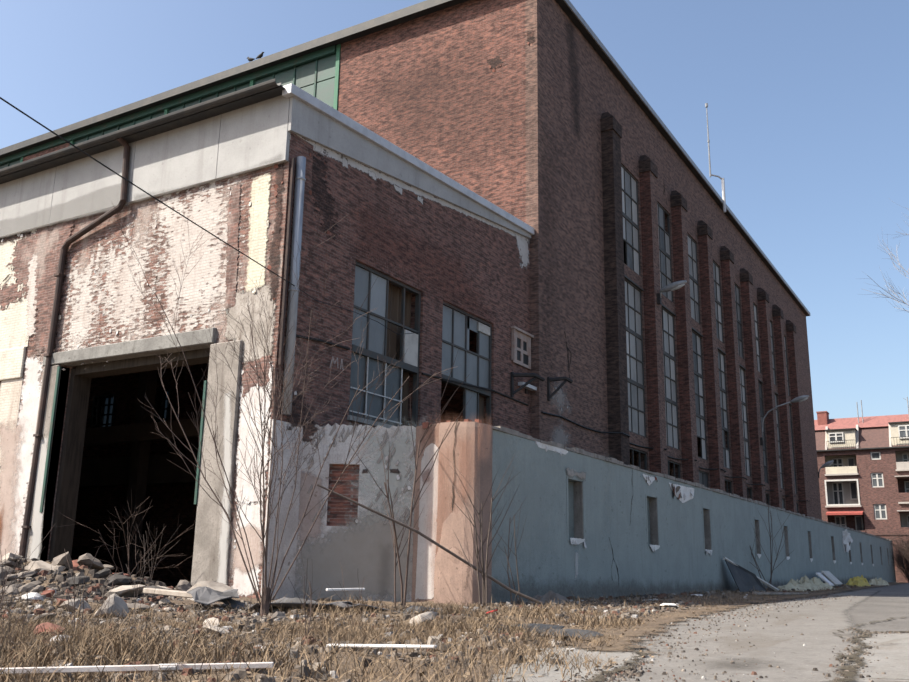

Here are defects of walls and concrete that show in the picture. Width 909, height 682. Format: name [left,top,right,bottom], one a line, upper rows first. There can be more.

spalling [289,133,530,268]
peeling [0,163,284,596]
peeling [287,391,357,541]
spalling [669,483,694,503]
spalling [842,529,874,567]